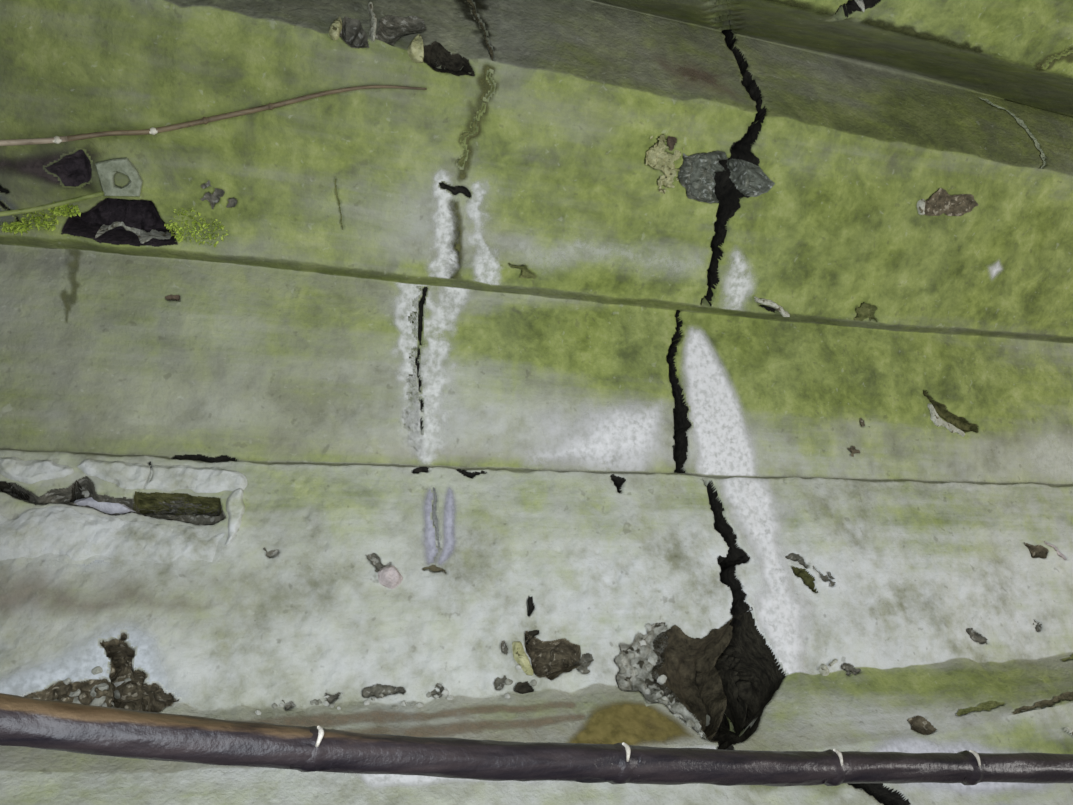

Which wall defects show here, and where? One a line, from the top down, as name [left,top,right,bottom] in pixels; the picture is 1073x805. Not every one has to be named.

spalling [329,2,475,76]
crack [835,0,881,18]
spalling [646,134,775,204]
crack [395,0,499,478]
damp [726,252,752,310]
crack [666,1,767,649]
spalling [923,390,978,437]
damp [684,329,809,674]
spalling [24,633,179,713]
spalling [494,630,594,699]
spalling [615,607,786,750]
crack [847,783,910,805]